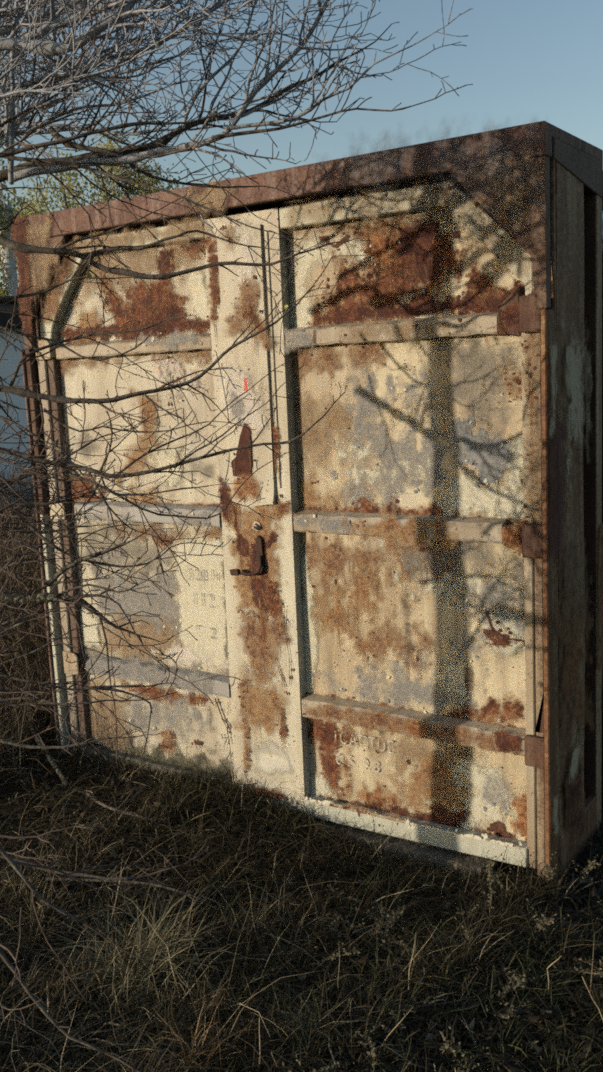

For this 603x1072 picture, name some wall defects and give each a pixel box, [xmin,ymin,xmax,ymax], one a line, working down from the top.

rust [10,215,271,349]
rust [58,357,118,376]
rust [151,350,210,363]
peeling [330,363,516,514]
rust [291,183,603,671]
peeling [500,368,522,402]
rust [68,389,492,773]
rust [247,786,286,800]
rust [302,694,527,842]